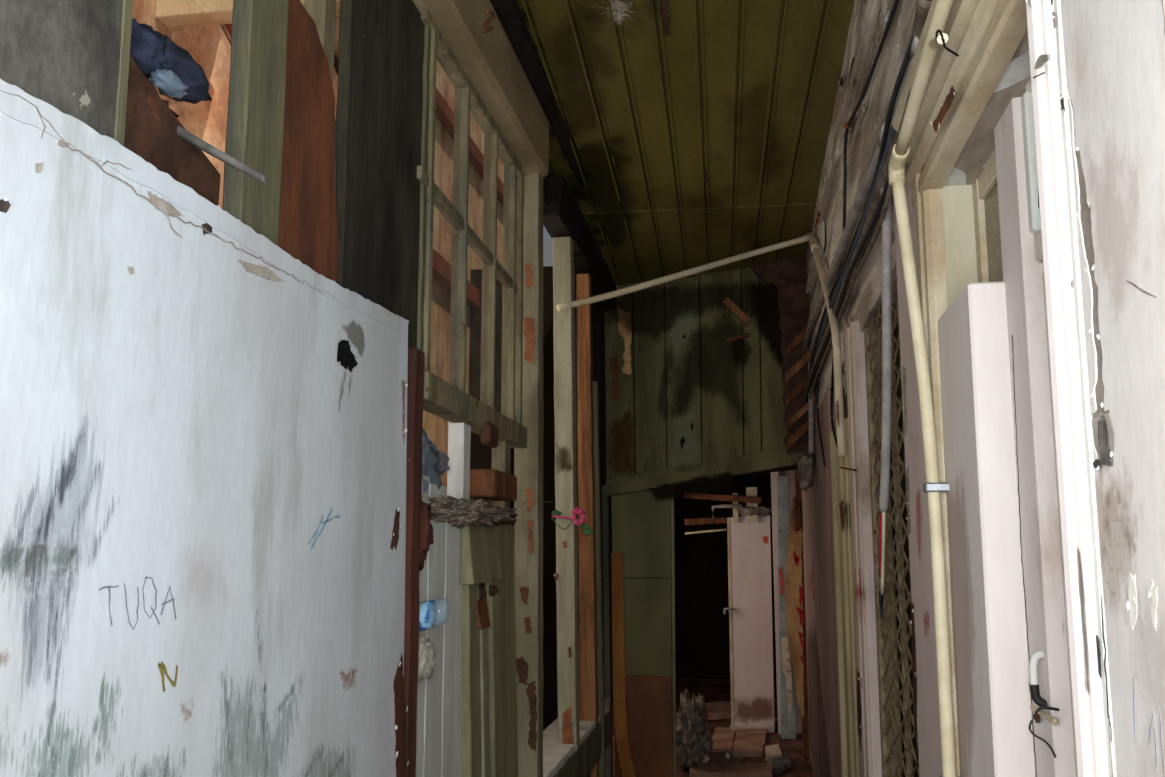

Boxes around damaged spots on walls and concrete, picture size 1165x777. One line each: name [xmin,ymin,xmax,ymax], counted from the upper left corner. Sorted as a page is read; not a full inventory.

crack [0,90,338,300]
spalling [337,338,358,373]
leakage [670,308,696,372]
leakage [671,408,698,467]